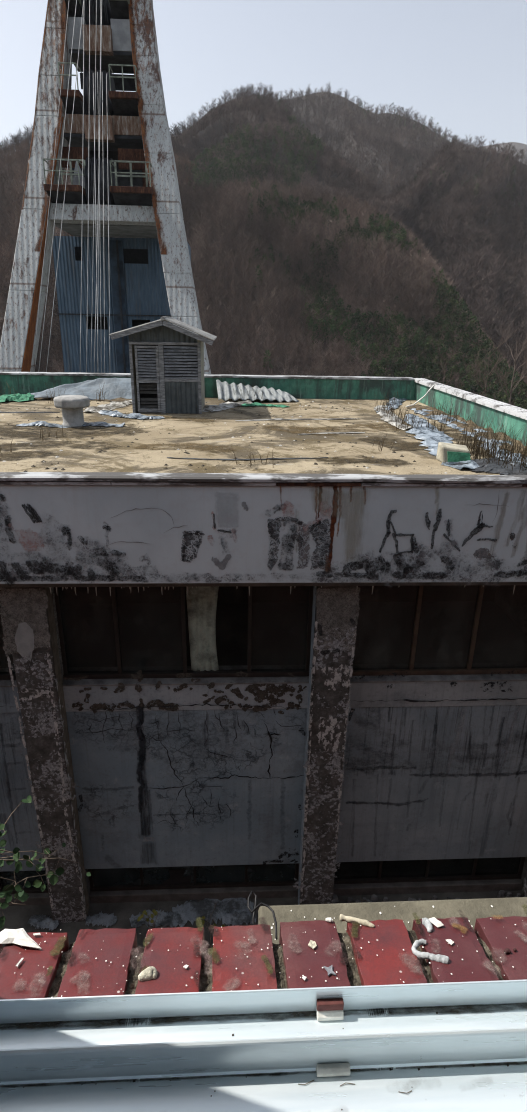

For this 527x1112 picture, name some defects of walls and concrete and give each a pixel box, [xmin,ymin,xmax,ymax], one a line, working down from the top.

corrosion [21,0,66,252]
corrosion [128,0,167,255]
peeling [208,513,236,570]
corrosion [315,486,366,573]
water stain [136,706,154,863]
peeling [0,586,360,923]
crack [72,703,305,829]